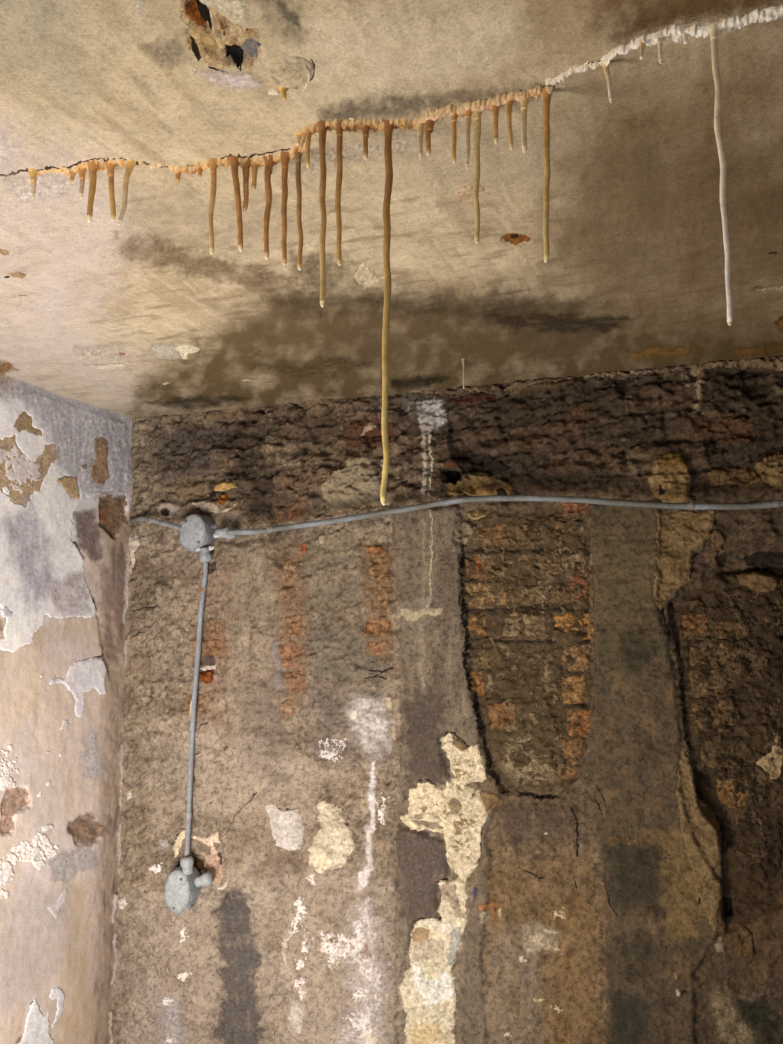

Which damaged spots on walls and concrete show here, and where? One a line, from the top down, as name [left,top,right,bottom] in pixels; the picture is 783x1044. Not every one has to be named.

flaking render [145,0,261,90]
crack [0,4,783,177]
damp [604,0,783,40]
damp [122,238,285,285]
damp [391,377,447,495]
peeling [0,380,131,652]
peeling [0,744,59,899]
peeling [39,654,106,757]
damp [281,510,449,1044]
flaking render [399,415,595,1044]
flaking render [658,551,783,959]
damp [212,891,264,1044]